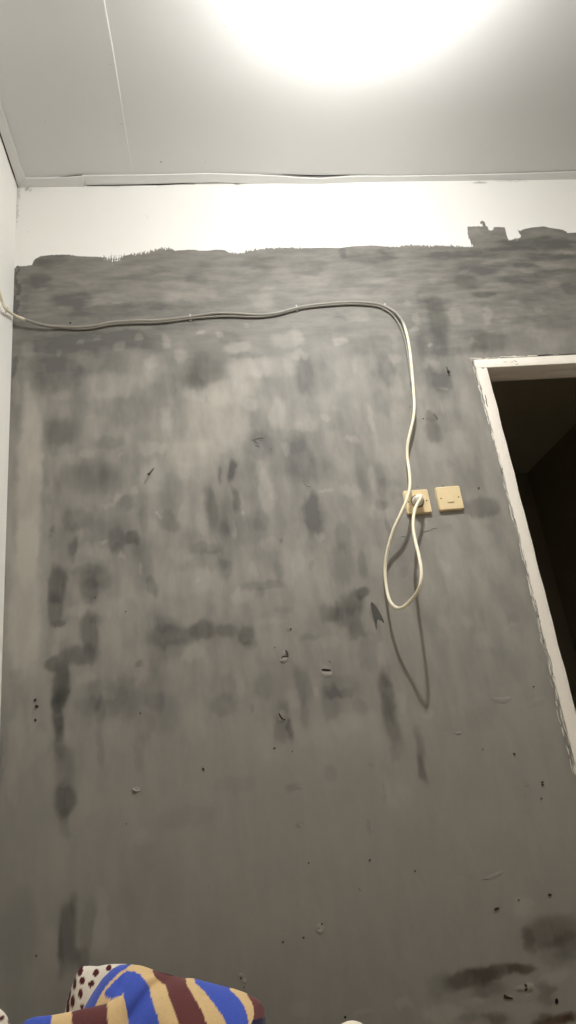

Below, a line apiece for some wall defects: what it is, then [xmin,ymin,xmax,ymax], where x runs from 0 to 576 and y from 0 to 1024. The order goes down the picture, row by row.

leakage [463,964,530,982]